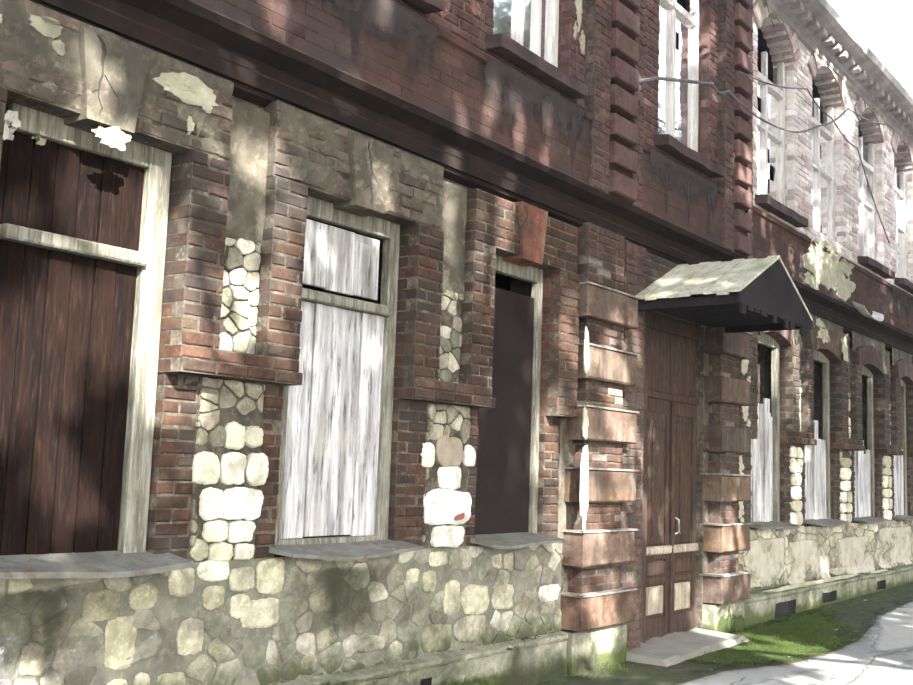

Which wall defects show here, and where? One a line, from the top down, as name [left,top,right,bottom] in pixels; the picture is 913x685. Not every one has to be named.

flaking render [28,14,65,56]
crack [92,35,120,113]
flaking render [152,72,219,114]
water stain [482,55,587,164]
peeling [3,110,21,140]
peeling [32,131,49,145]
peeling [91,126,132,151]
flaking render [186,116,195,135]
flaking render [801,238,856,302]
flaking render [816,318,830,343]
flaking render [841,333,849,362]